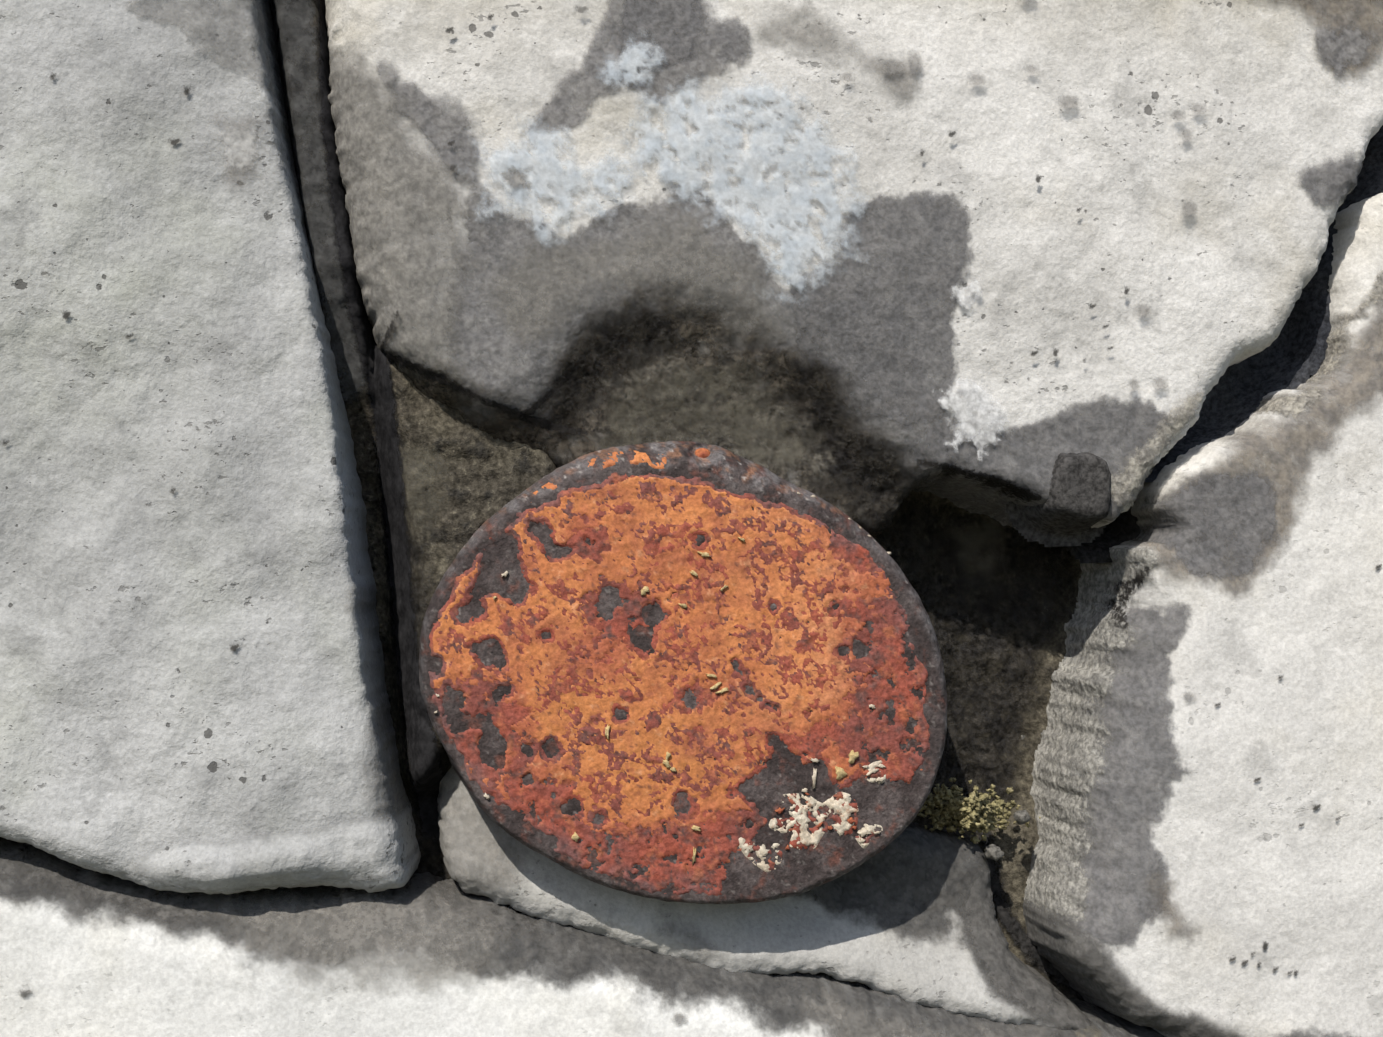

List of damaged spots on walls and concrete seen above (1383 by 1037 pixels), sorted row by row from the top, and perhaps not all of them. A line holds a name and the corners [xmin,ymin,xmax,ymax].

corrosion [695,448,710,458]
leakage [376,0,1239,1037]
leakage [1128,304,1383,594]
leakage [0,695,541,977]